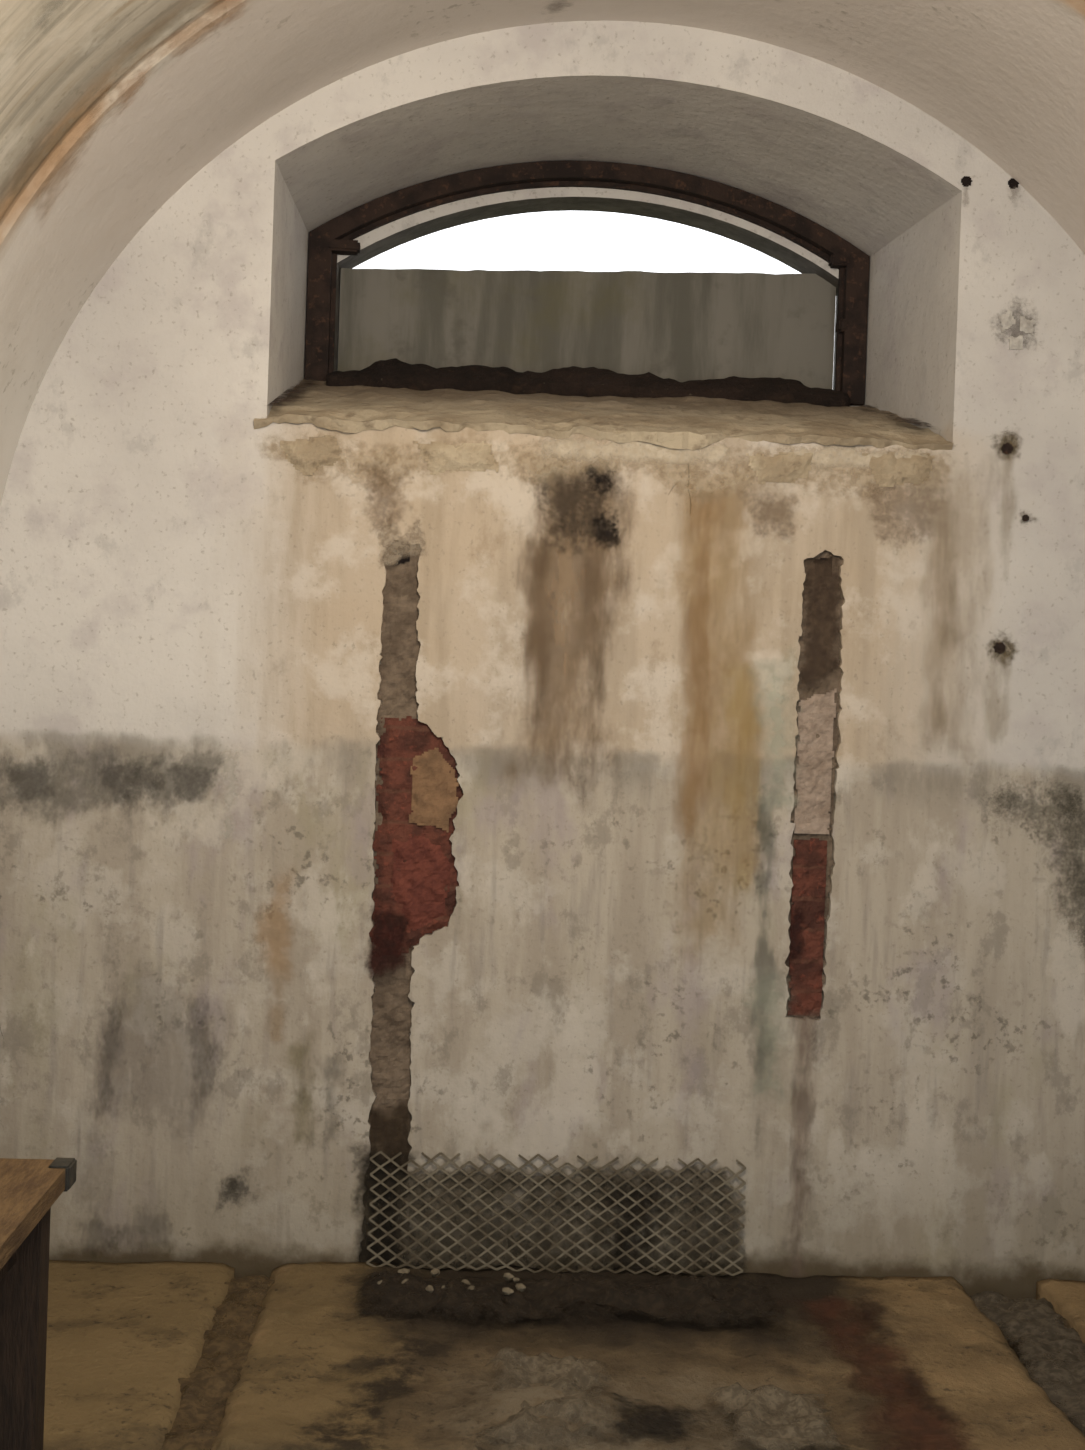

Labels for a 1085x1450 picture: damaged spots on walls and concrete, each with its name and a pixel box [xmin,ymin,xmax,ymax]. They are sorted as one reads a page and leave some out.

peeling [380,524,425,564]
damp [530,467,623,763]
spalling [366,716,464,977]
flaking render [787,838,827,1016]